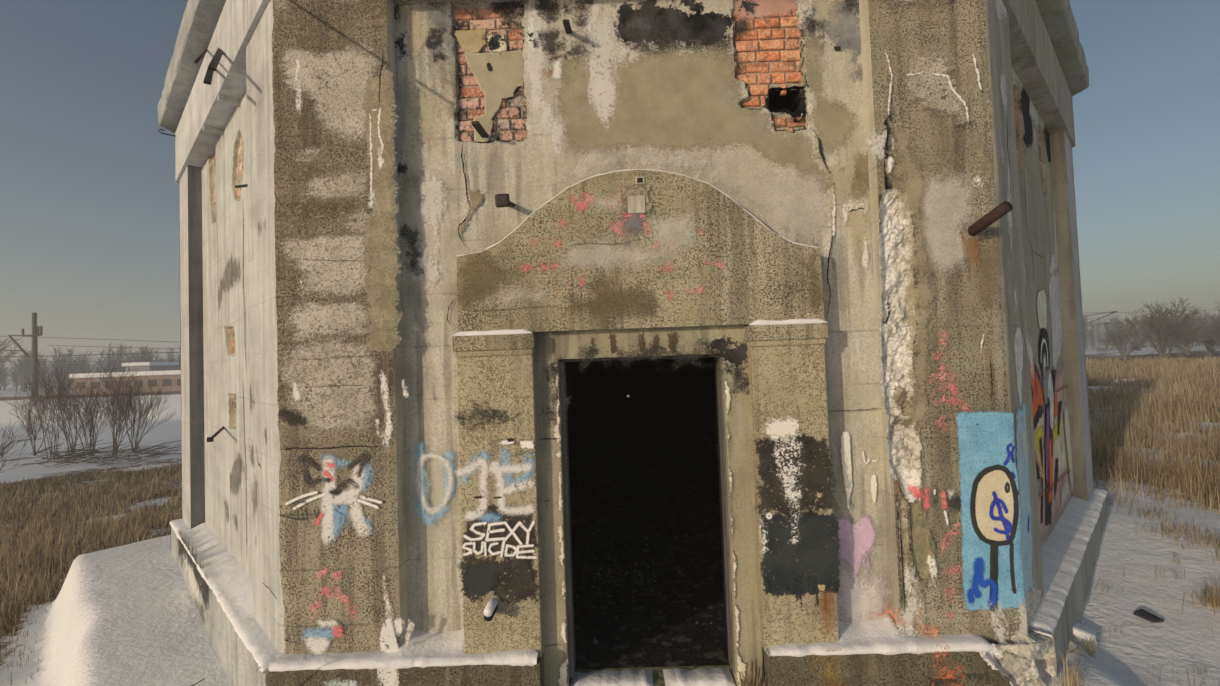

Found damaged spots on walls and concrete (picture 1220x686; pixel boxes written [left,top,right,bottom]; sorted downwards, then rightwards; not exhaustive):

flaking render [450,0,529,143]
leakage [516,0,869,269]
flaking render [730,0,810,133]
leakage [456,253,508,309]
leakage [569,280,658,328]
leakage [892,131,938,426]
spalling [980,584,1058,686]